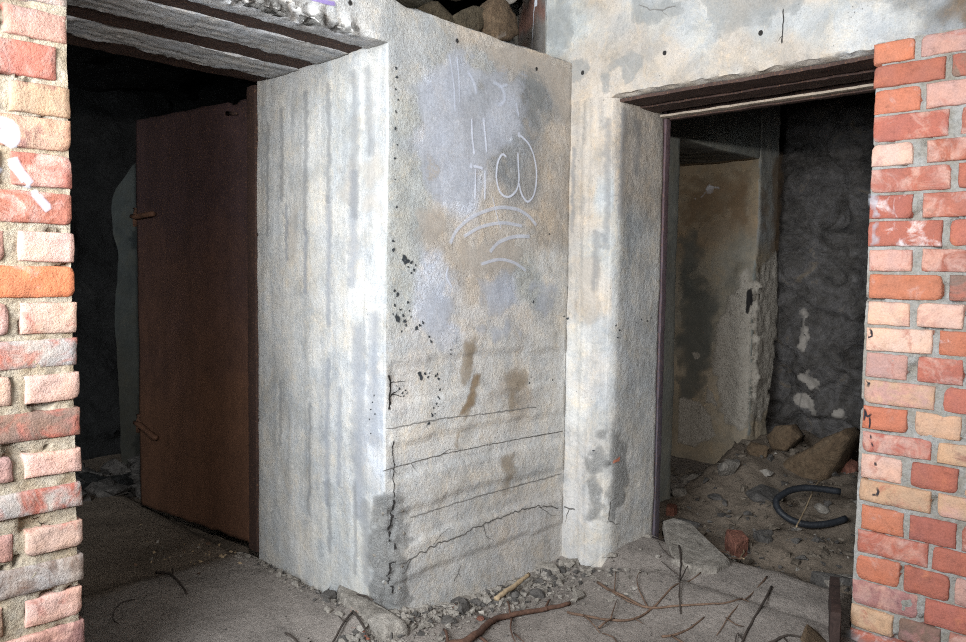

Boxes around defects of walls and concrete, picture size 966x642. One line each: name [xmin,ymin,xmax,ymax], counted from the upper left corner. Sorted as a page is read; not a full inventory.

spalling [243,0,359,34]
corrosion [461,375,479,414]
crack [383,375,562,497]
spalling [678,252,778,447]
crack [397,474,575,574]